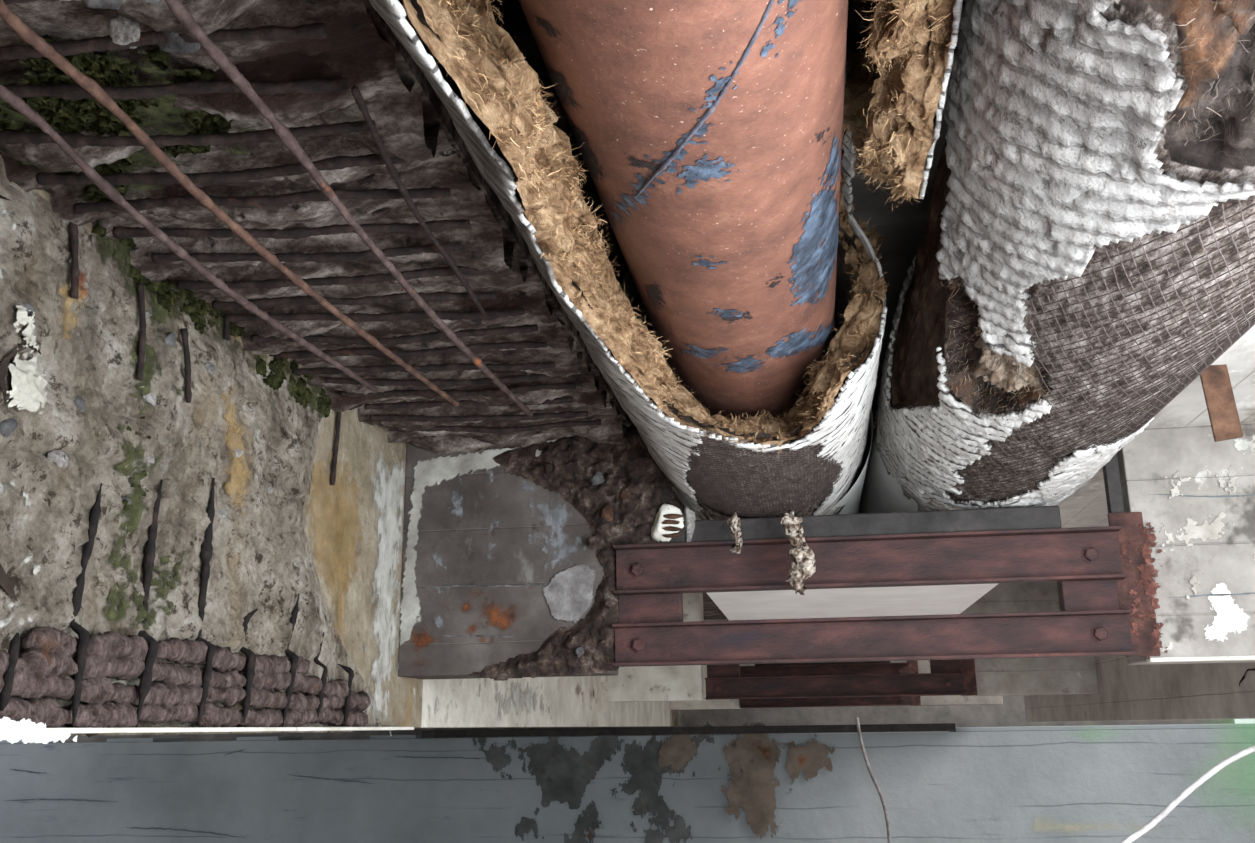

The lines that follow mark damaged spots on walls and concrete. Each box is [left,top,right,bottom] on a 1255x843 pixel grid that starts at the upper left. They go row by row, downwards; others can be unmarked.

spalling [0,0,674,744]
peeling [1165,471,1191,499]
peeling [1120,512,1235,658]
peeling [1186,576,1250,642]
peeling [473,716,835,843]